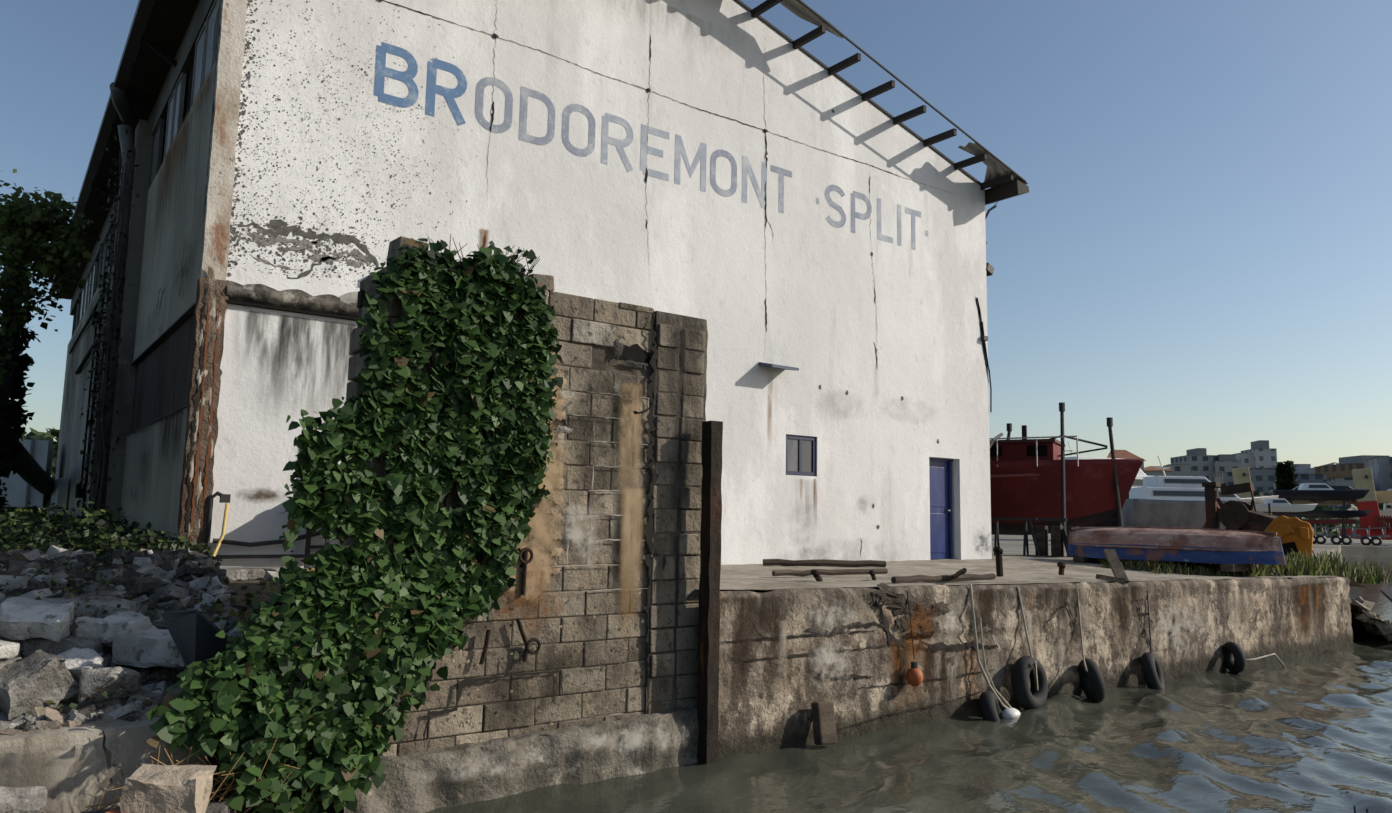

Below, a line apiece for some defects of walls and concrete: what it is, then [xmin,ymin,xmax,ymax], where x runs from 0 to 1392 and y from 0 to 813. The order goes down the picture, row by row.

peeling [185,0,472,544]
leakage [274,317,300,371]
leakage [324,322,355,370]
leakage [980,590,994,636]
leakage [1281,583,1323,622]
leakage [927,648,954,691]